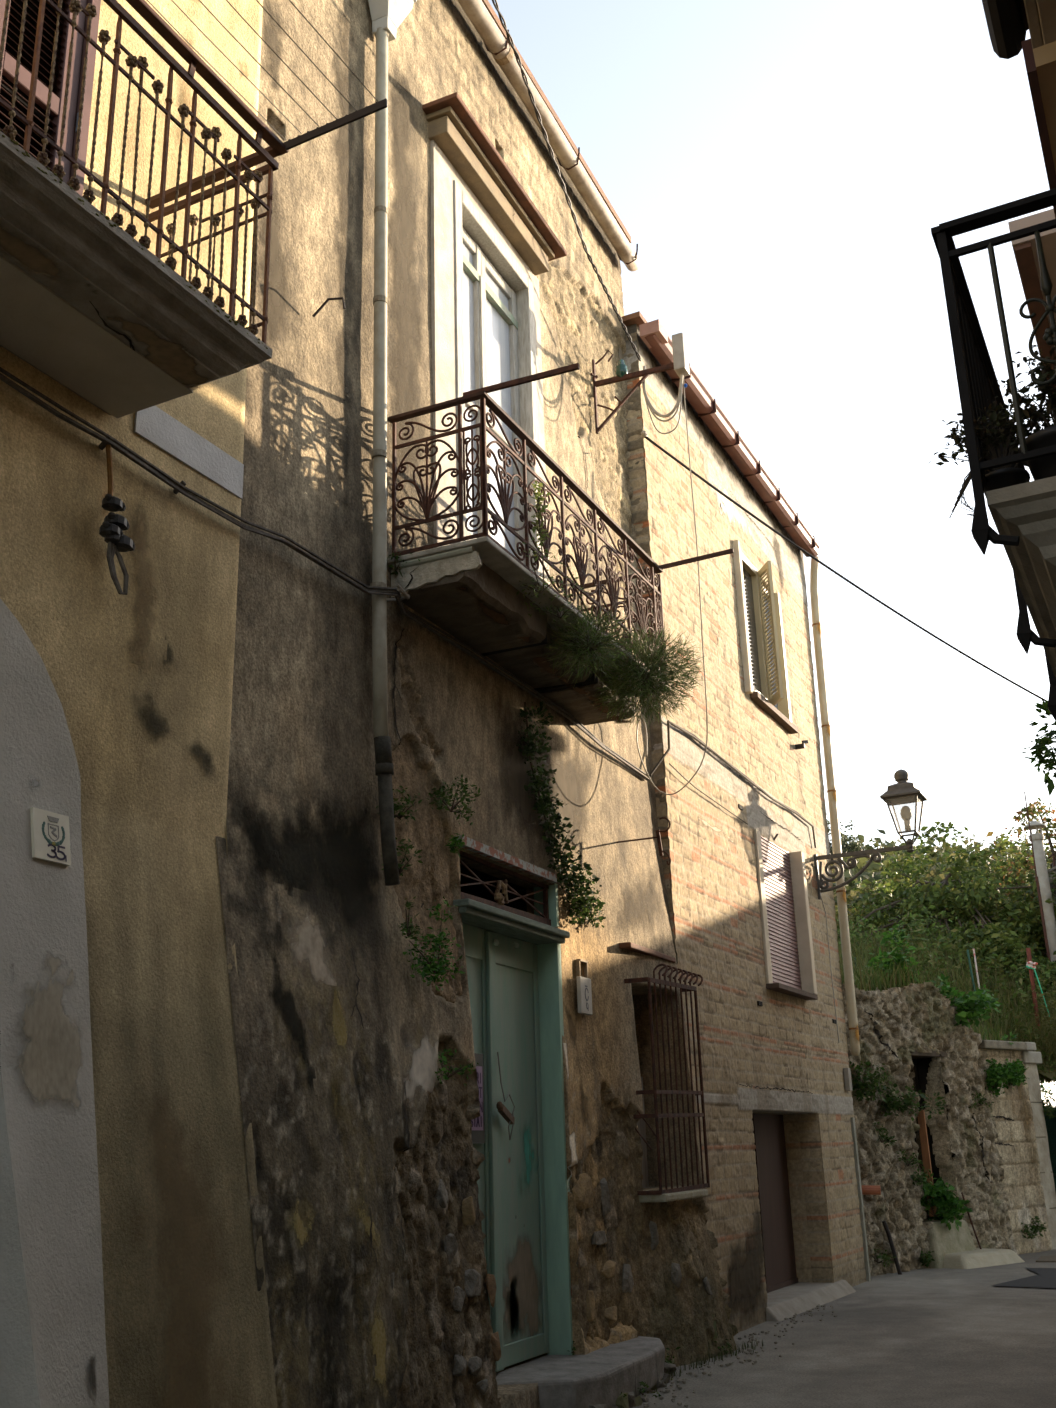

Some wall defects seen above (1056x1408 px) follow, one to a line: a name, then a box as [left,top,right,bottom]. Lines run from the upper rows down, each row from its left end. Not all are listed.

water stain [129,506,173,665]
water stain [140,696,169,739]
water stain [192,743,215,774]
spalling [393,1041,540,1408]